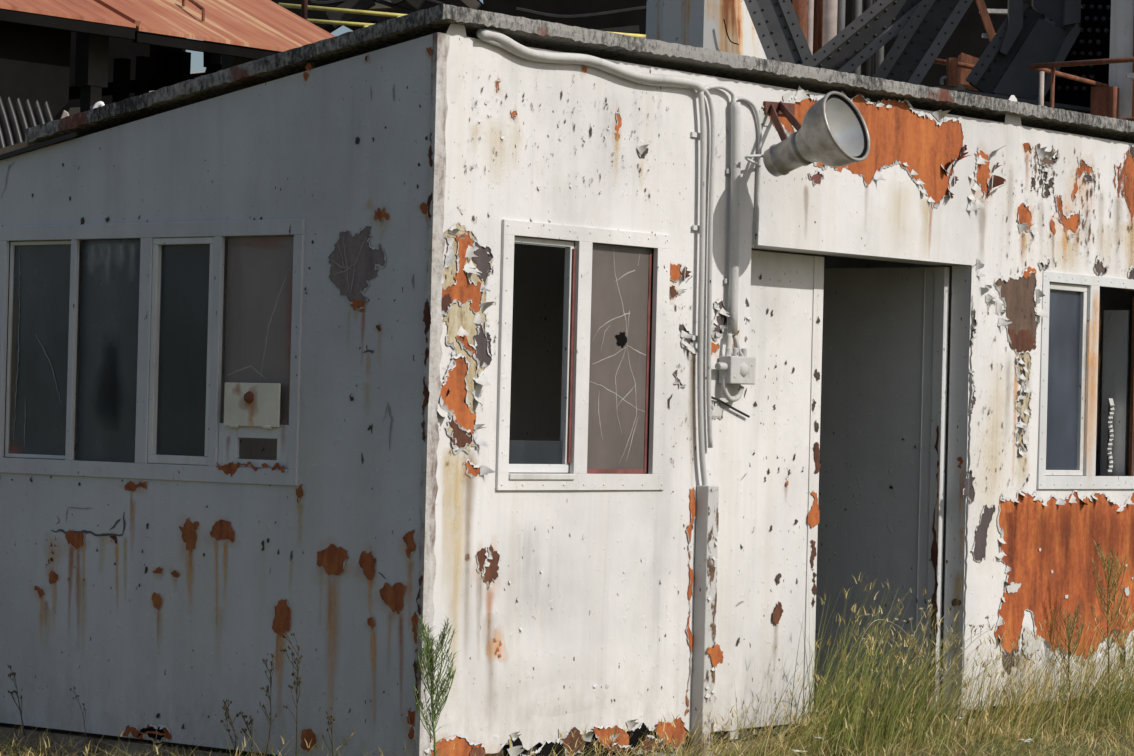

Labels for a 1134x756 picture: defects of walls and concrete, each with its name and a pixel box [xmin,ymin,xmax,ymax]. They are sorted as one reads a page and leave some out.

corrosion [1018,143,1100,245]
corrosion [1114,150,1134,221]
peeling [328,226,386,319]
peeling [437,208,499,528]
peeling [963,143,1133,563]
corrosion [34,530,85,621]
corrosion [152,517,235,582]
corrosion [995,488,1134,674]
corrosion [272,599,291,665]
corrosion [300,729,316,752]
peeling [507,728,567,756]
peeling [610,719,658,742]